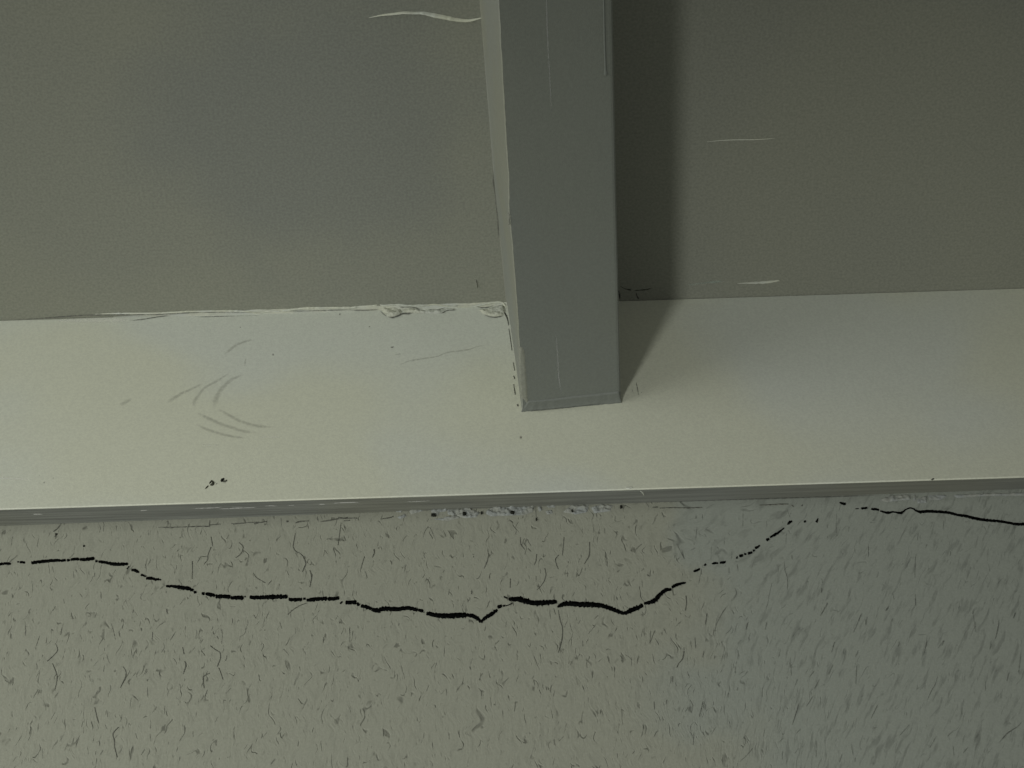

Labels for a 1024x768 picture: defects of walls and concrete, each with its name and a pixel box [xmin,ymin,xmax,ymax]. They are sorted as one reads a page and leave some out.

crack [0,496,1024,652]
crack [103,621,246,760]